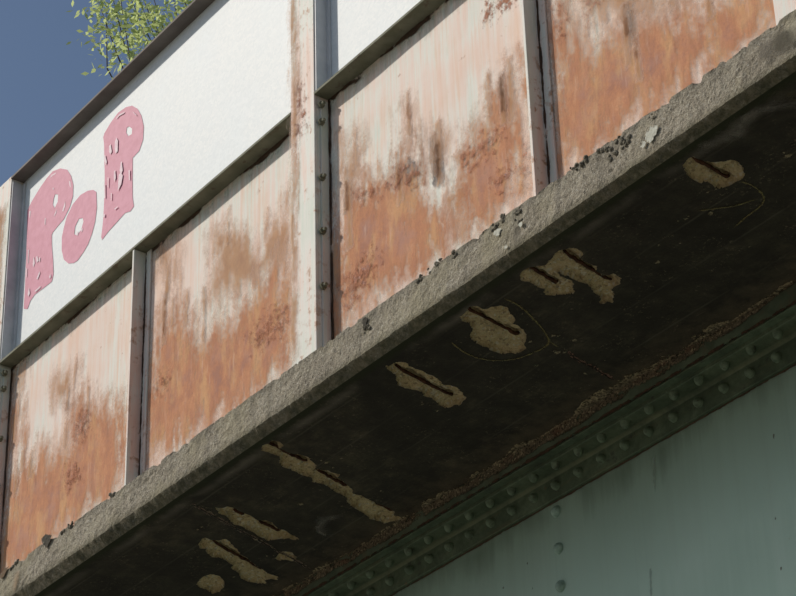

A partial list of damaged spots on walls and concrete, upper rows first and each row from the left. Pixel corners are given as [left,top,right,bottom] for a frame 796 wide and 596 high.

rust [138,0,308,476]
rust [328,44,533,340]
spalling [520,248,622,304]
rust [536,0,776,184]
spalling [683,157,745,215]
rust [0,352,127,574]
spalling [197,525,278,594]
spalling [216,506,298,561]
spalling [261,280,796,596]
rust [302,299,796,596]